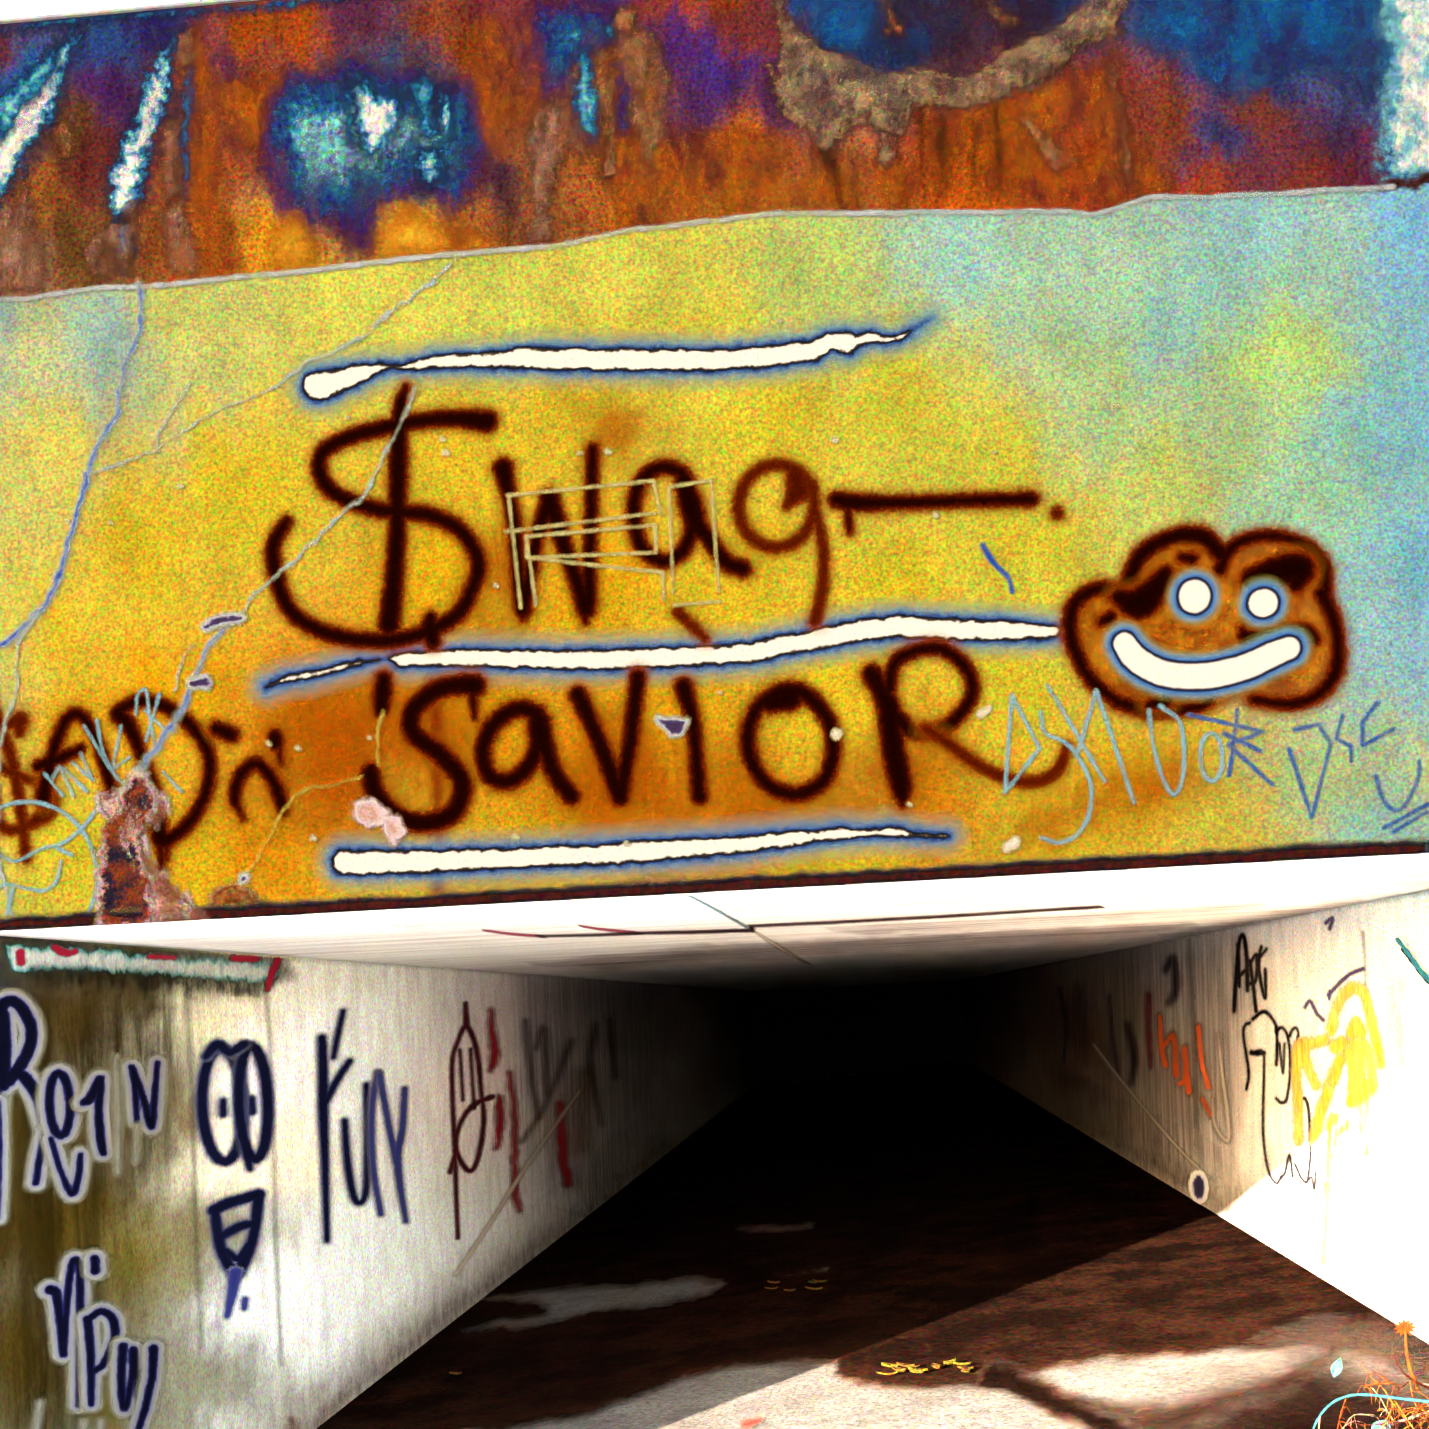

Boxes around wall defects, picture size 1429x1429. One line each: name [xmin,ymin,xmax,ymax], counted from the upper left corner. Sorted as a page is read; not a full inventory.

corrosion [218,76,276,147]
corrosion [476,19,538,145]
corrosion [609,129,777,228]
corrosion [799,145,858,211]
corrosion [991,69,1166,204]
corrosion [273,215,315,267]
corrosion [375,208,493,259]
crack [0,262,453,771]
crack [249,710,384,871]
crack [0,859,14,917]
spalling [92,760,266,926]